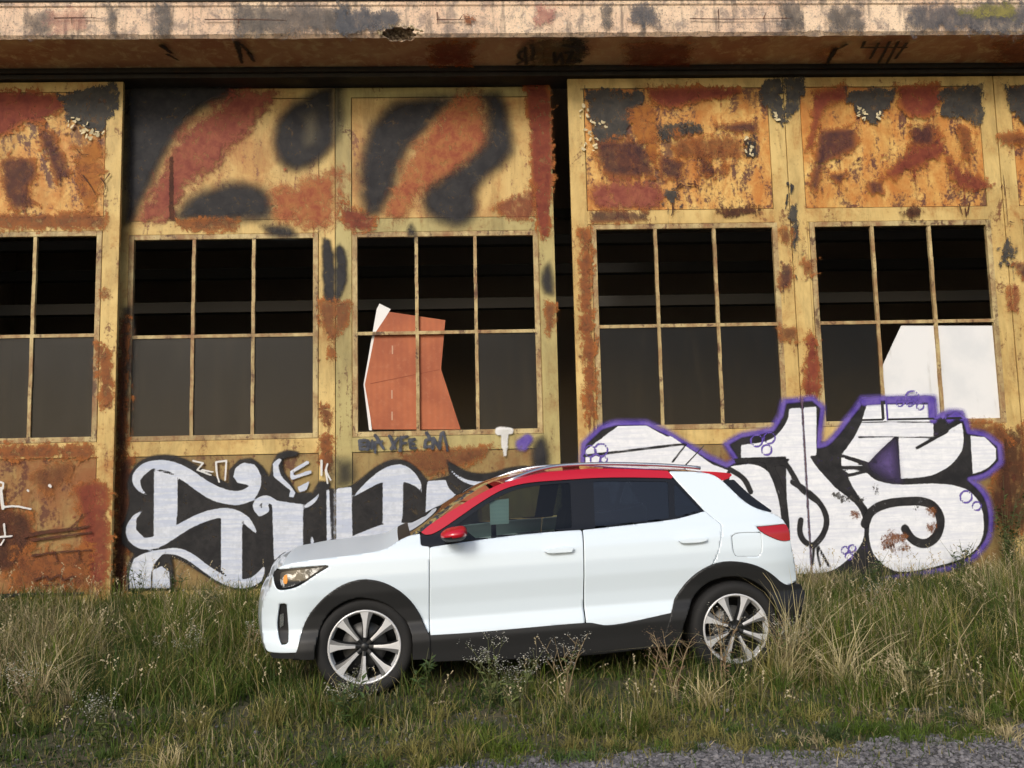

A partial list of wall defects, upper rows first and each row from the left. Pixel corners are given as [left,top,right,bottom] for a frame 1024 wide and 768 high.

corrosion [0,124,113,234]
peeling [55,81,125,140]
peeling [579,85,645,151]
peeling [743,135,758,160]
corrosion [806,120,862,194]
peeling [840,86,896,126]
corrosion [866,122,996,198]
corrosion [574,100,764,432]
corrosion [92,340,116,413]
corrosion [775,322,823,399]
corrosion [968,419,1024,539]
corrosion [0,440,117,600]